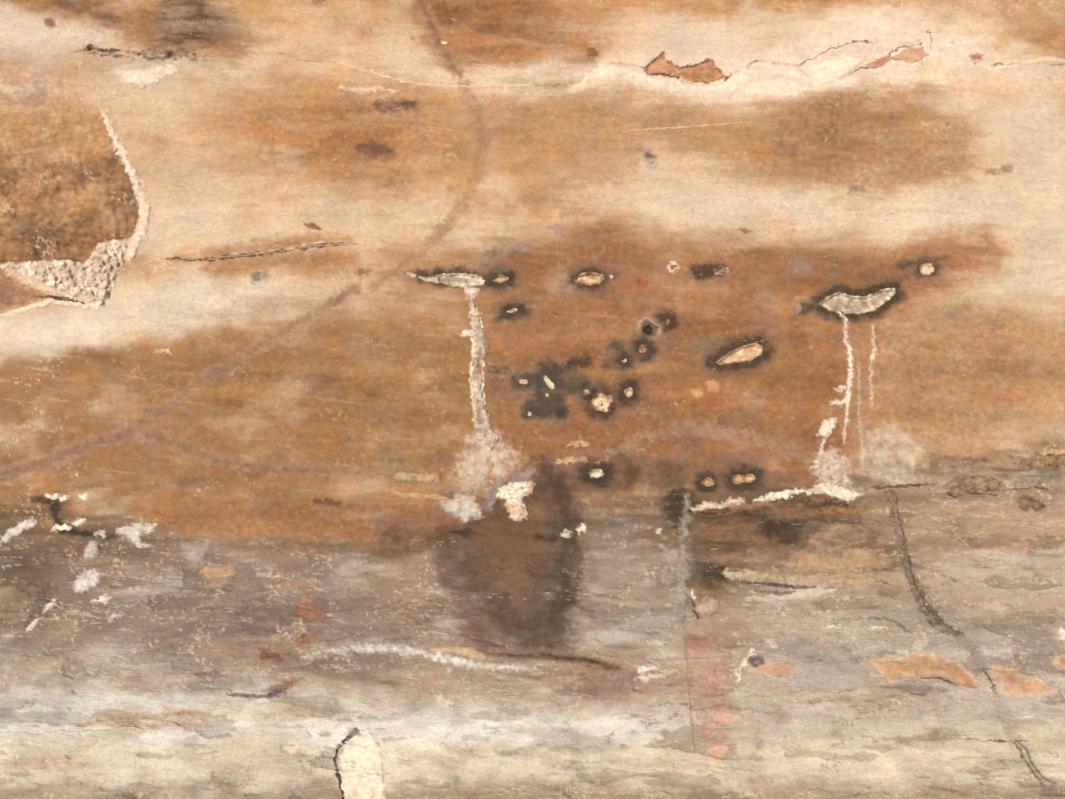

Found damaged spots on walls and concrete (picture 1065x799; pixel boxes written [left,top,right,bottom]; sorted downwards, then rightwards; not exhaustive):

crack [331,28,933,105]
spalling [644,51,729,85]
crack [968,51,1065,72]
spalling [0,57,154,318]
water stain [983,162,1015,177]
crack [160,221,372,288]
water stain [0,0,597,498]
rust [0,0,1019,498]
water stain [311,497,343,508]
water stain [362,284,1065,683]
water stain [0,490,123,634]